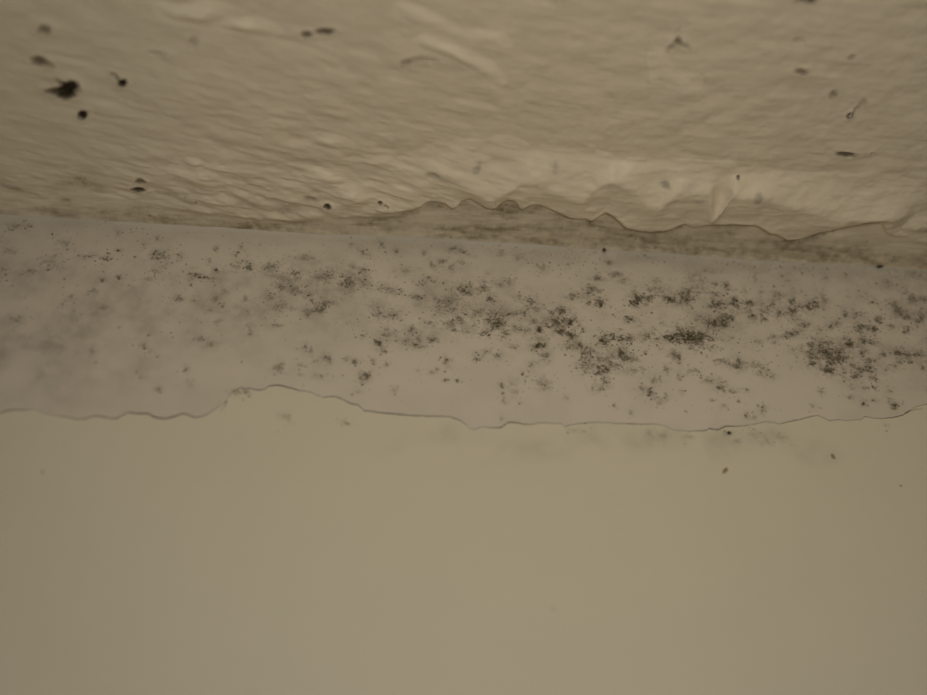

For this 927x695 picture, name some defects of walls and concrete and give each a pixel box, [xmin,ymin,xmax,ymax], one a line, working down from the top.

water stain [531,309,642,383]
water stain [656,285,754,348]